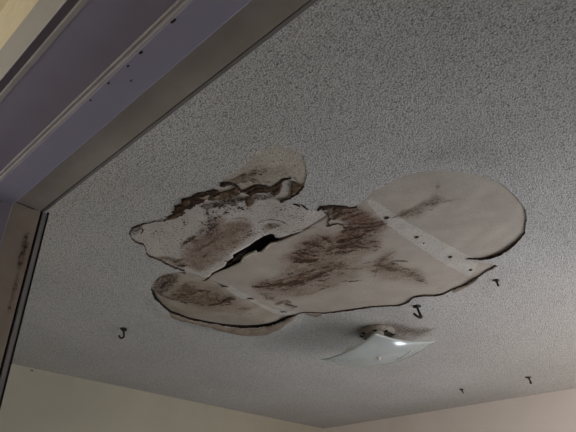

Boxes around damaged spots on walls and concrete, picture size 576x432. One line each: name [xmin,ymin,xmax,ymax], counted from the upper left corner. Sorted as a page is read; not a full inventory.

water stain [154,274,252,315]
water stain [161,195,302,271]
crack [204,232,299,281]
water stain [255,206,387,307]
peeling [129,144,527,317]